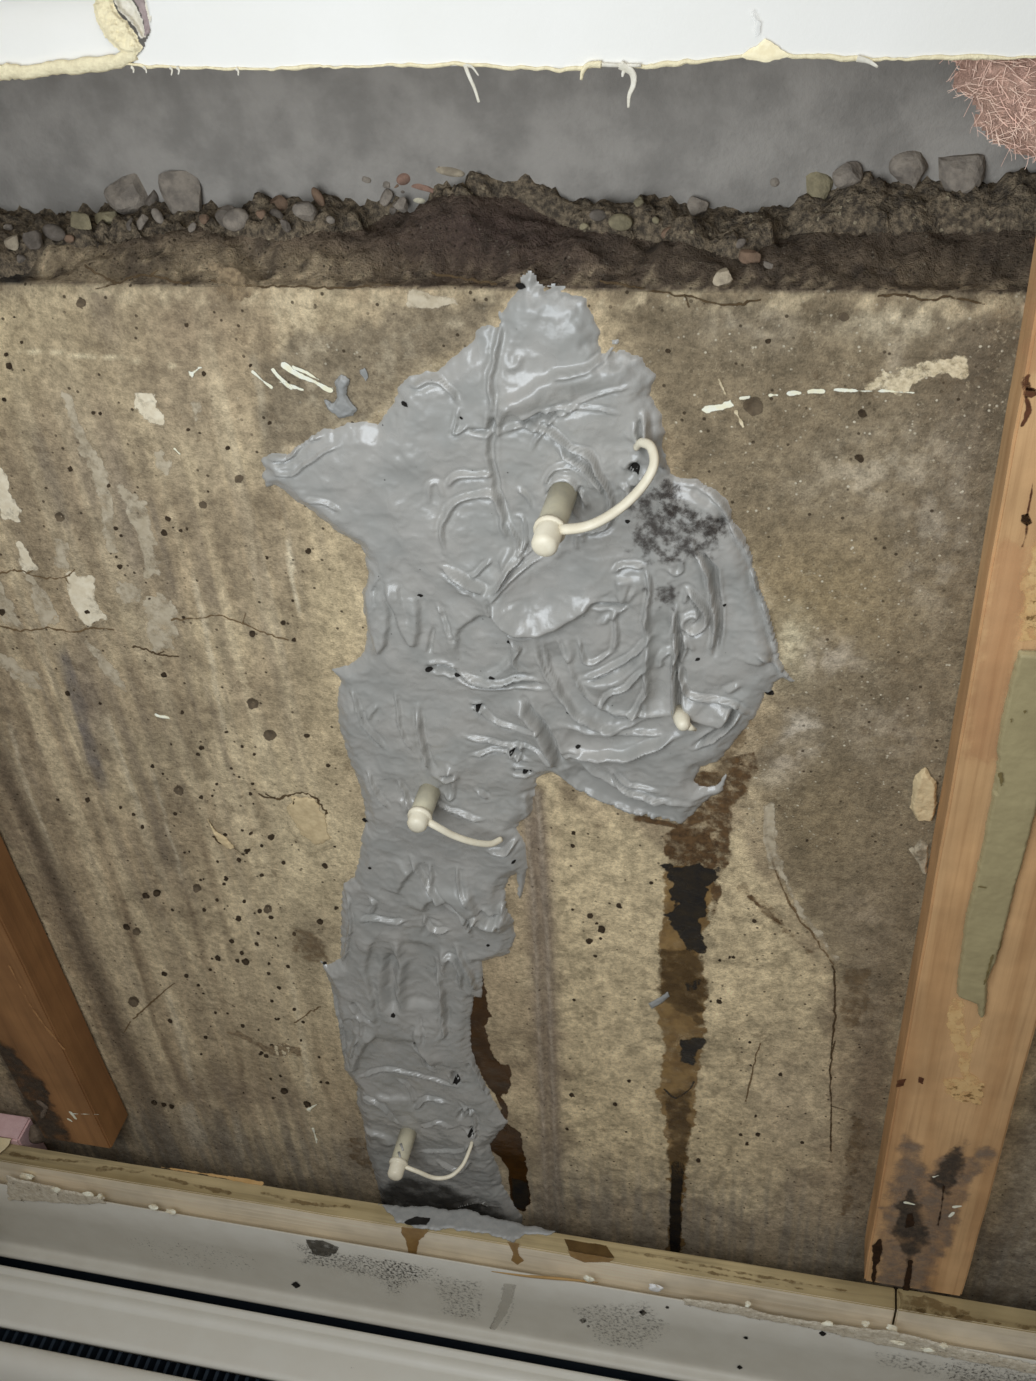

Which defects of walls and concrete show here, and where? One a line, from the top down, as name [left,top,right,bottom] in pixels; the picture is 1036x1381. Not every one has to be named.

spalling [0,0,152,81]
peeling [0,468,22,522]
peeling [0,582,21,627]
peeling [16,512,107,628]
peeling [89,644,125,689]
crack [770,858,847,1152]
leakage [382,977,531,1220]
leakage [655,863,719,1253]
leakage [401,1227,428,1254]
leakage [508,1242,524,1265]
leakage [876,1142,995,1291]